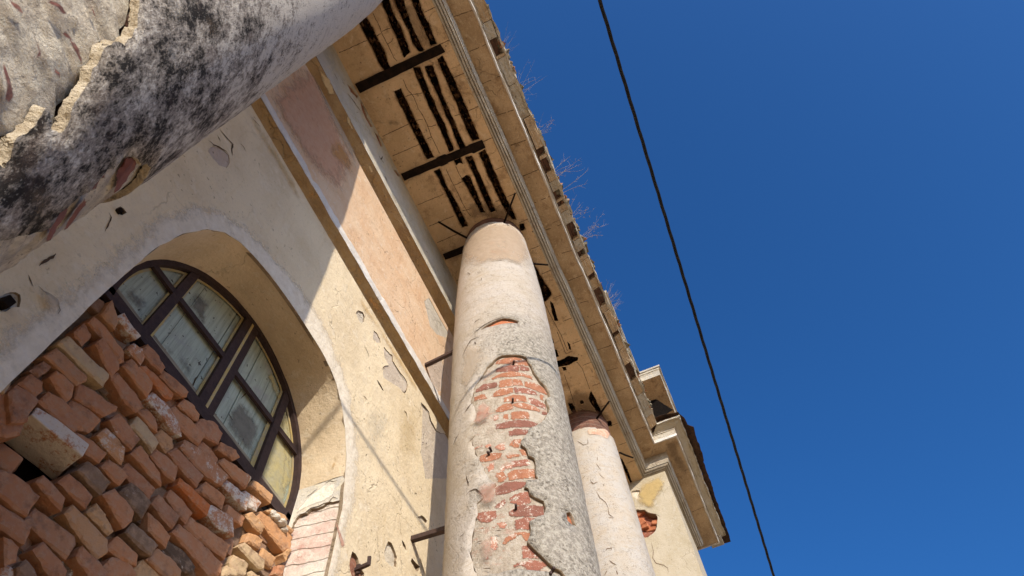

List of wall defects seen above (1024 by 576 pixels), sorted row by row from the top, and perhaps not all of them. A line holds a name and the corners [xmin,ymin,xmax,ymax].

spalling [0,0,129,136]
damp [278,71,351,185]
spalling [0,157,140,273]
peeling [463,224,526,261]
peeling [373,332,407,392]
spalling [282,496,361,576]
spalling [468,357,560,576]
spalling [632,491,657,538]